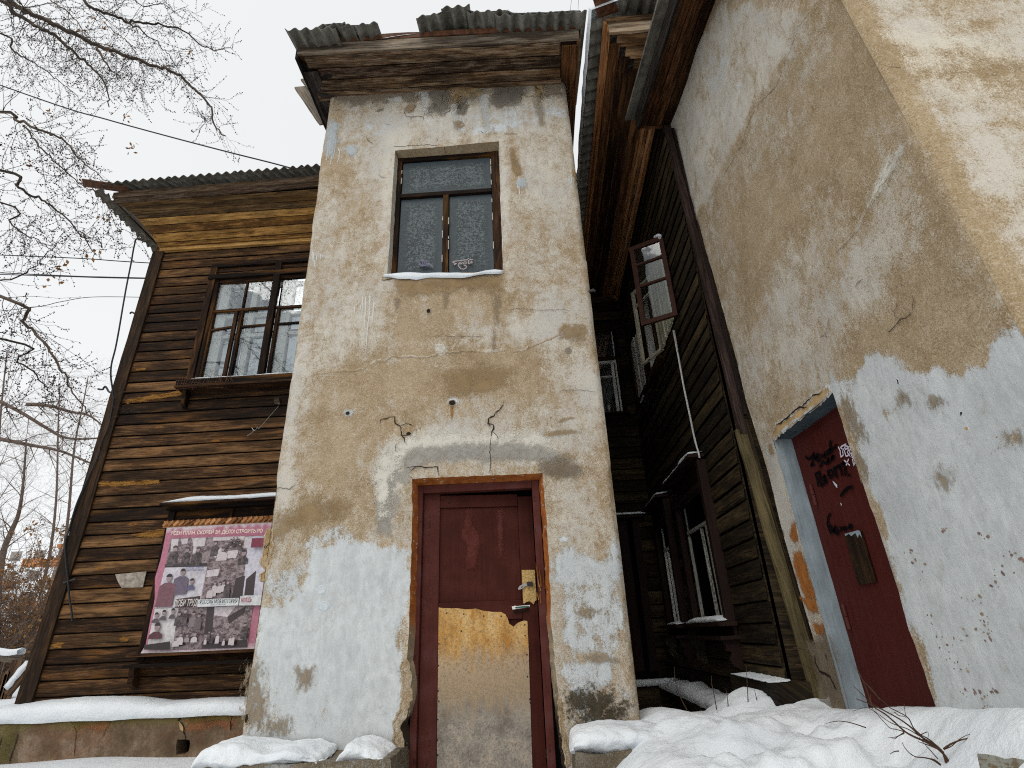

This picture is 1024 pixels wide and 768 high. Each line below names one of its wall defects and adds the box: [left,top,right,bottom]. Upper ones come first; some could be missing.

damp [335,86,524,131]
crack [380,416,439,475]
damp [372,417,581,519]
crack [487,401,504,473]
peeling [768,384,869,484]
spalling [259,528,275,582]
peeling [239,662,293,737]
peeling [293,665,315,692]
spalling [392,660,413,747]
peeling [574,607,599,620]
peeling [584,652,620,663]
peeling [927,594,992,673]